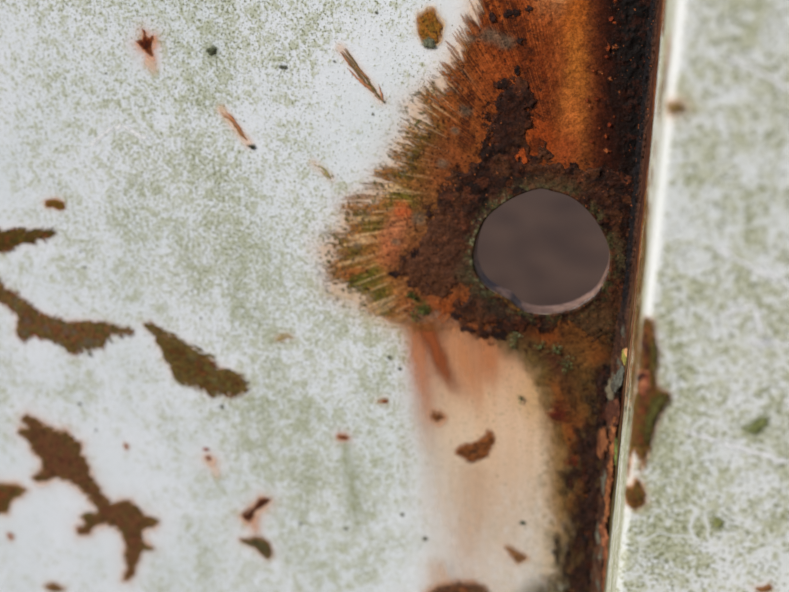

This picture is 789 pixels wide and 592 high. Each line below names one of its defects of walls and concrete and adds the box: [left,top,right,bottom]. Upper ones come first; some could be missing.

rust [136,29,156,69]
rust [222,112,247,140]
rust [318,0,686,592]